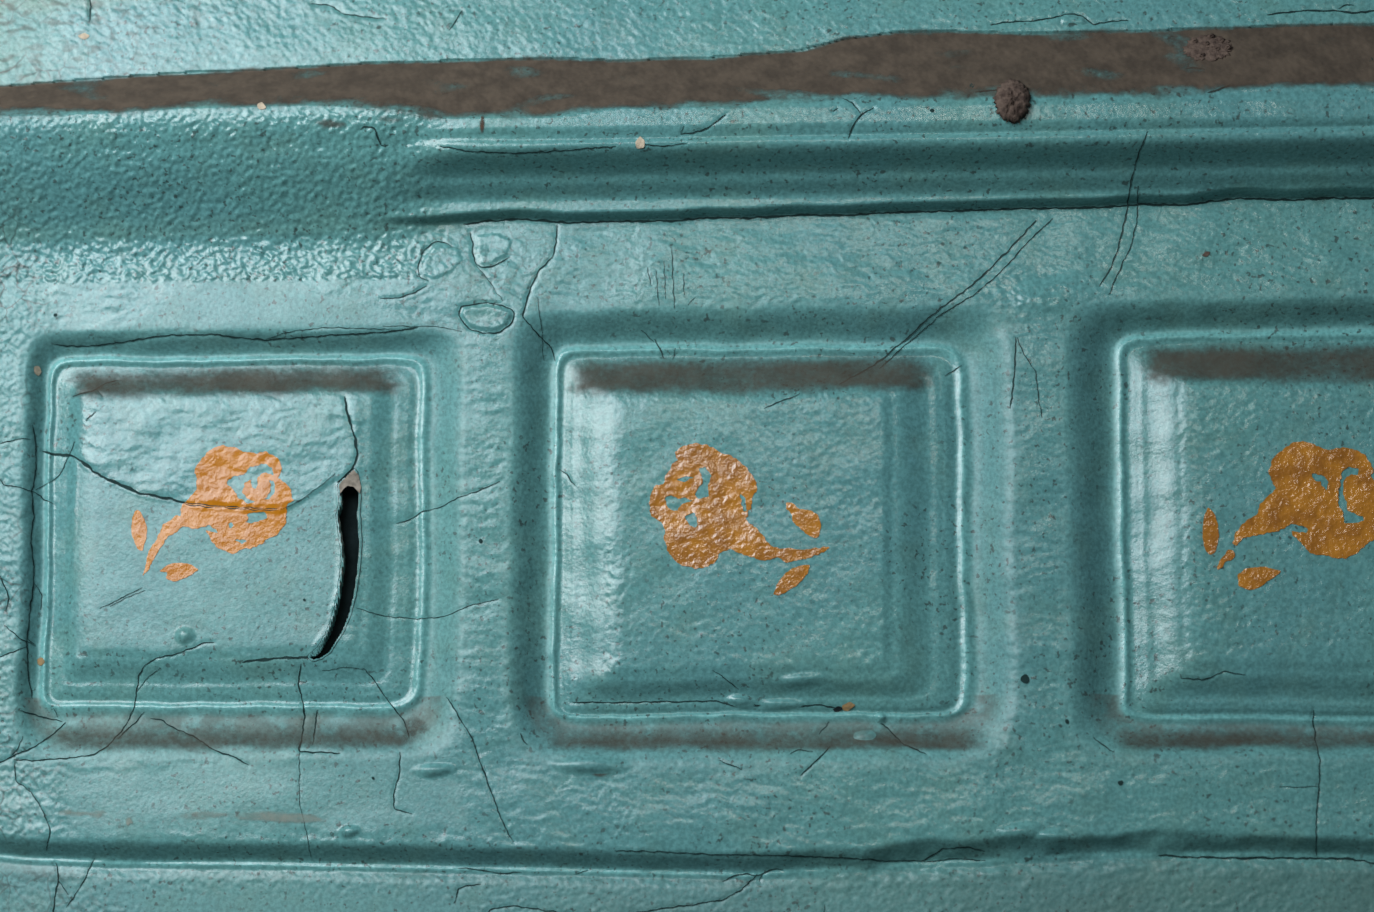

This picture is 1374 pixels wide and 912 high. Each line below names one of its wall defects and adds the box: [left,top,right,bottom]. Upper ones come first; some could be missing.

crack [0,396,500,912]
crack [1181,671,1245,680]
crack [1158,711,1374,864]